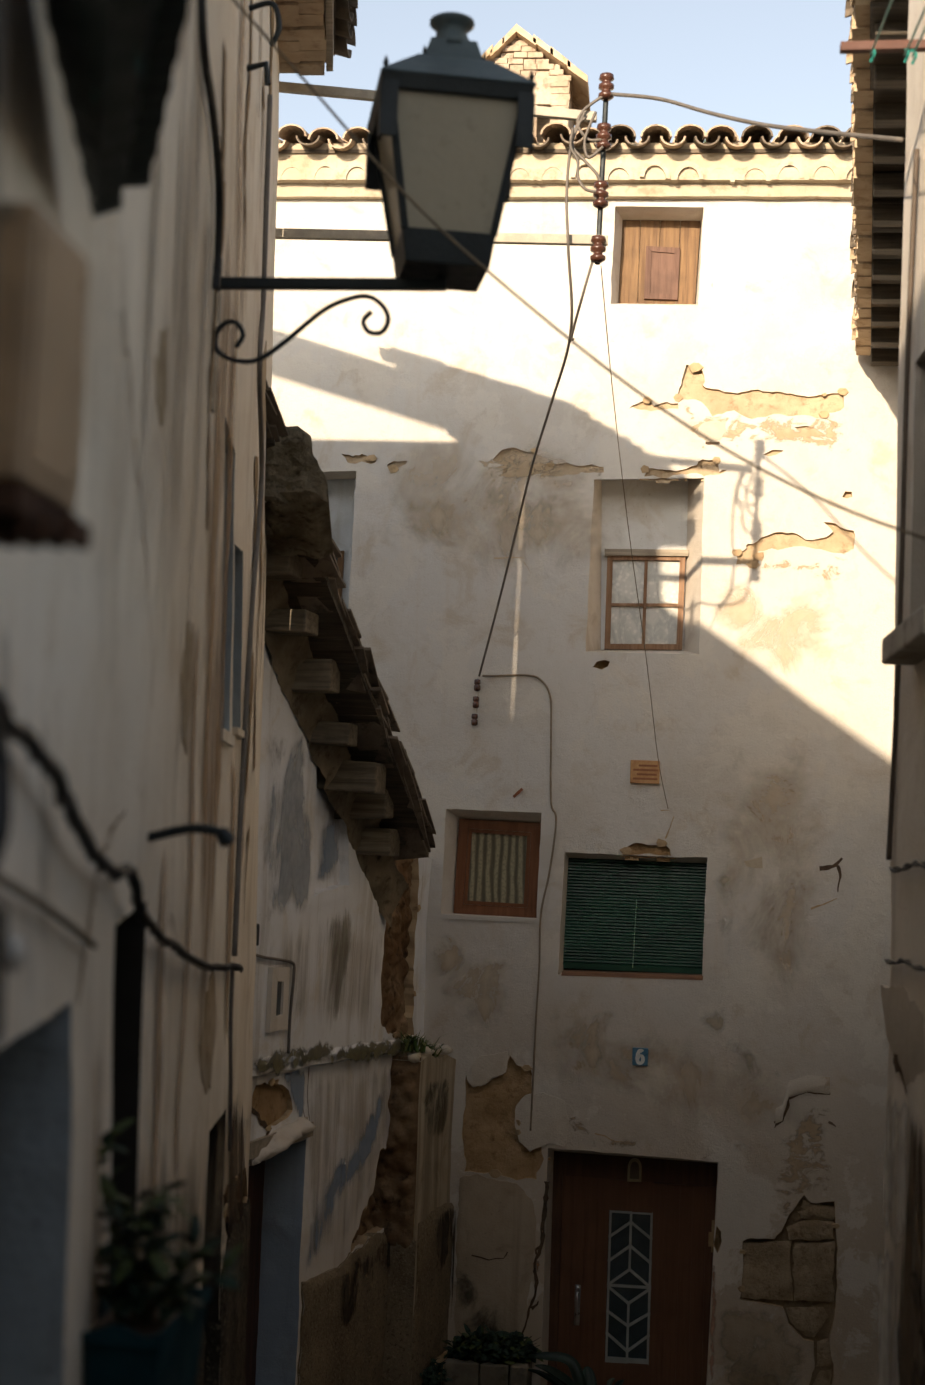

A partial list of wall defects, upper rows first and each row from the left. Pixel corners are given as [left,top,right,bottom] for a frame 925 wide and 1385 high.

spalling [630,363,848,431]
spalling [493,447,604,477]
spalling [639,457,726,483]
spalling [732,522,855,569]
spalling [619,839,676,862]
spalling [252,1078,293,1131]
spalling [462,1056,550,1180]
spalling [738,1195,840,1385]